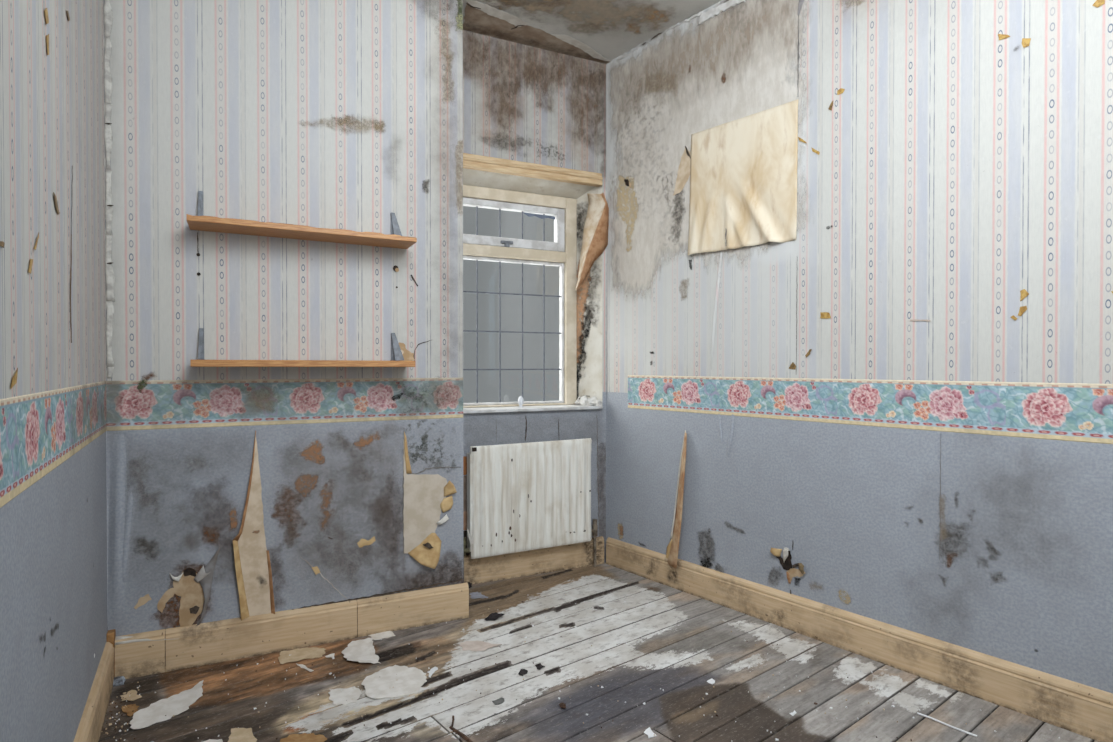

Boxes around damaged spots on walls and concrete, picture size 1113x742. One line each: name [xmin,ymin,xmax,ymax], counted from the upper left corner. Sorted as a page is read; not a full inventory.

damp [463,33,606,153]
flaking render [610,0,808,294]
spalling [134,548,220,628]
flaking render [238,438,271,616]
damp [272,488,306,542]
damp [320,481,333,529]
flaking render [403,439,457,569]
spalling [770,544,806,594]
damp [941,527,962,582]